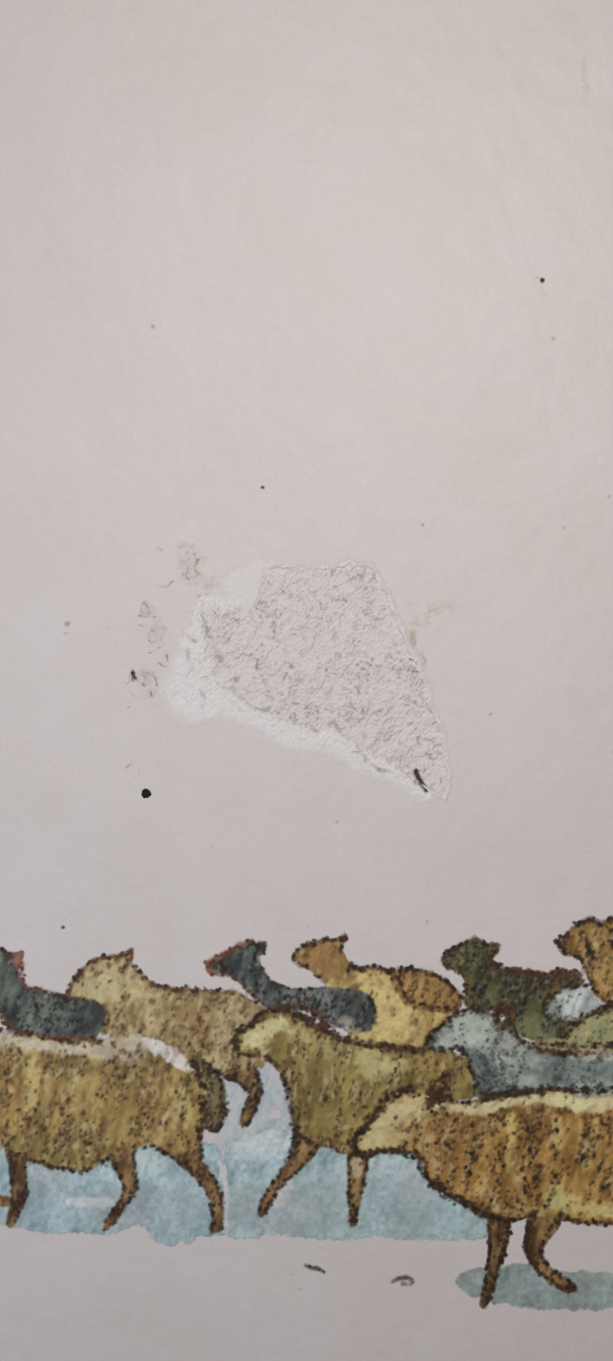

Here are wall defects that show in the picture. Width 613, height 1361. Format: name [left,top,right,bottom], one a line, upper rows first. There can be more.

peeling [157,554,455,804]